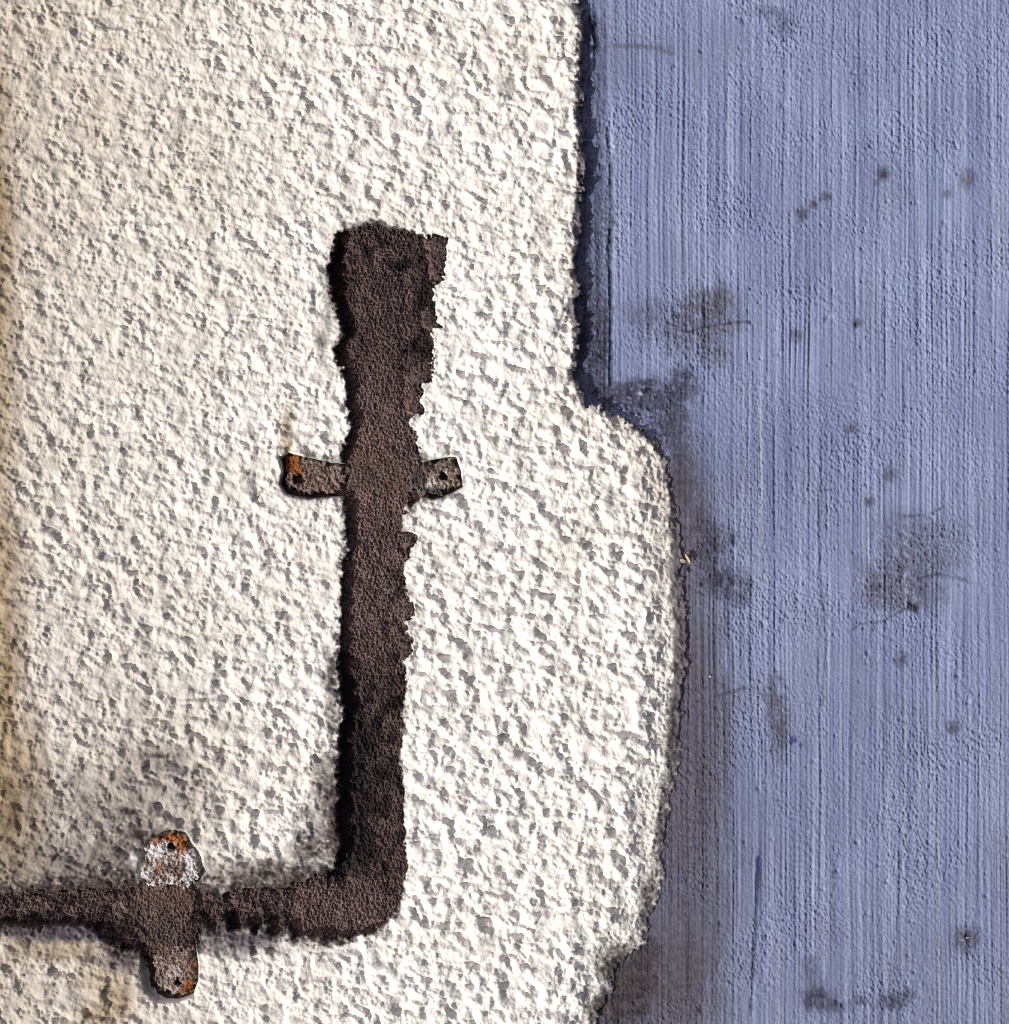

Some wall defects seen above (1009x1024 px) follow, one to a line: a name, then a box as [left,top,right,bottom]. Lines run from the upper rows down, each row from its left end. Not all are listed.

peeling [567,0,588,392]
corrosion [283,441,302,474]
corrosion [0,512,23,843]
corrosion [154,832,191,859]
peeling [617,418,691,952]